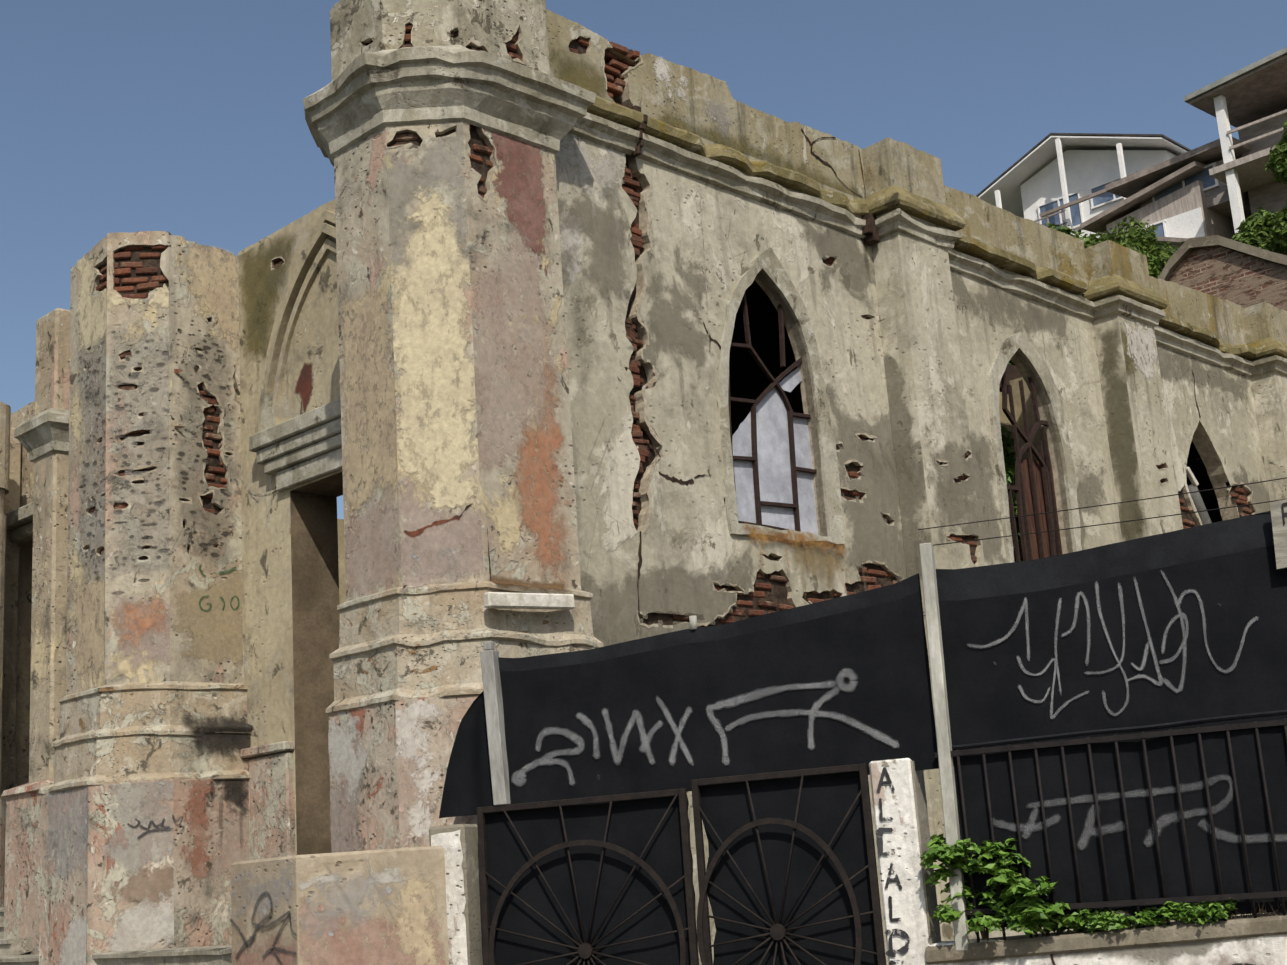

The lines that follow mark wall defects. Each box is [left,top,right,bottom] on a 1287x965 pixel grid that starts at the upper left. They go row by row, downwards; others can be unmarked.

spalling [568,38,589,54]
spalling [603,41,688,107]
peeling [385,123,547,274]
water stain [555,134,630,300]
crack [622,105,711,619]
water stain [631,250,707,376]
water stain [775,207,876,298]
crack [801,128,866,197]
peeling [73,243,243,677]
water stain [797,355,1006,580]
spalling [638,552,904,629]
water stain [183,713,253,755]